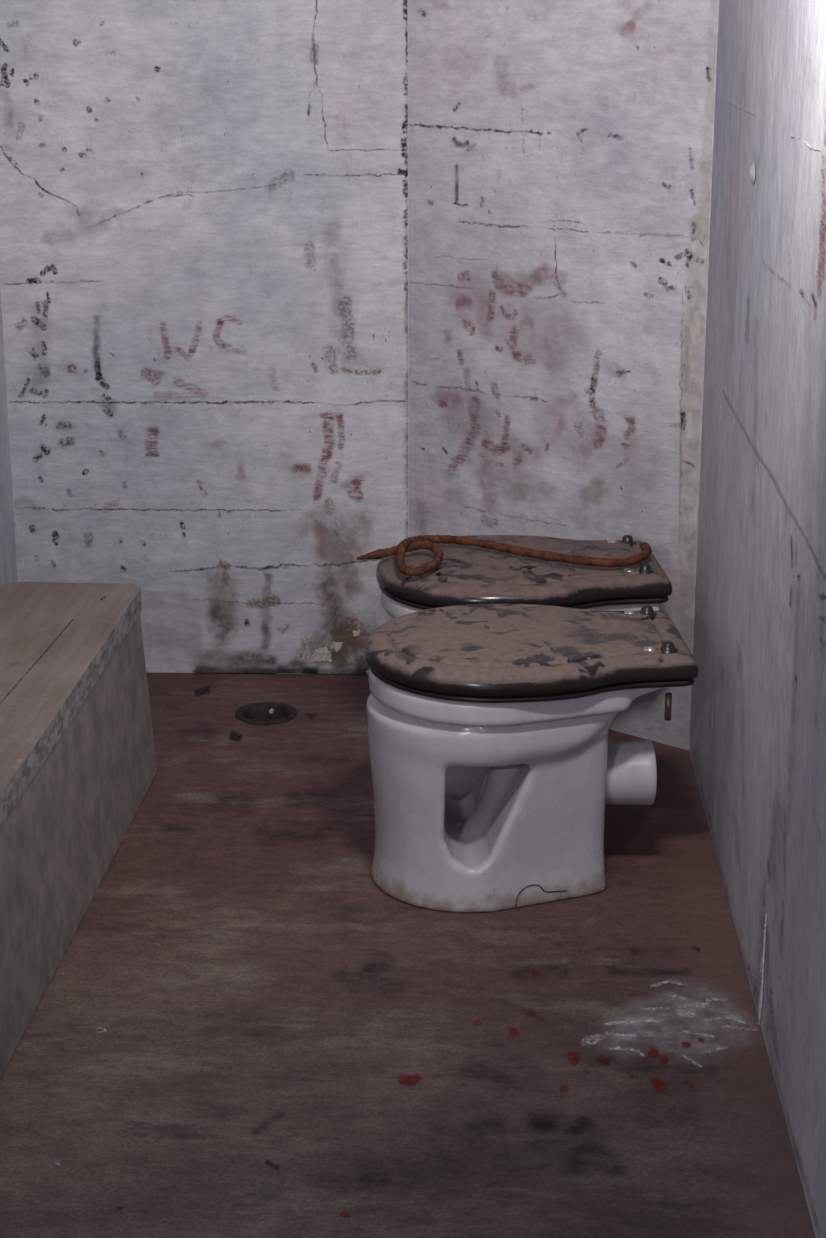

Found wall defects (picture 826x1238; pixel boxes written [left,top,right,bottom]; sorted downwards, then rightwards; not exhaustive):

crack [317,0,543,300]